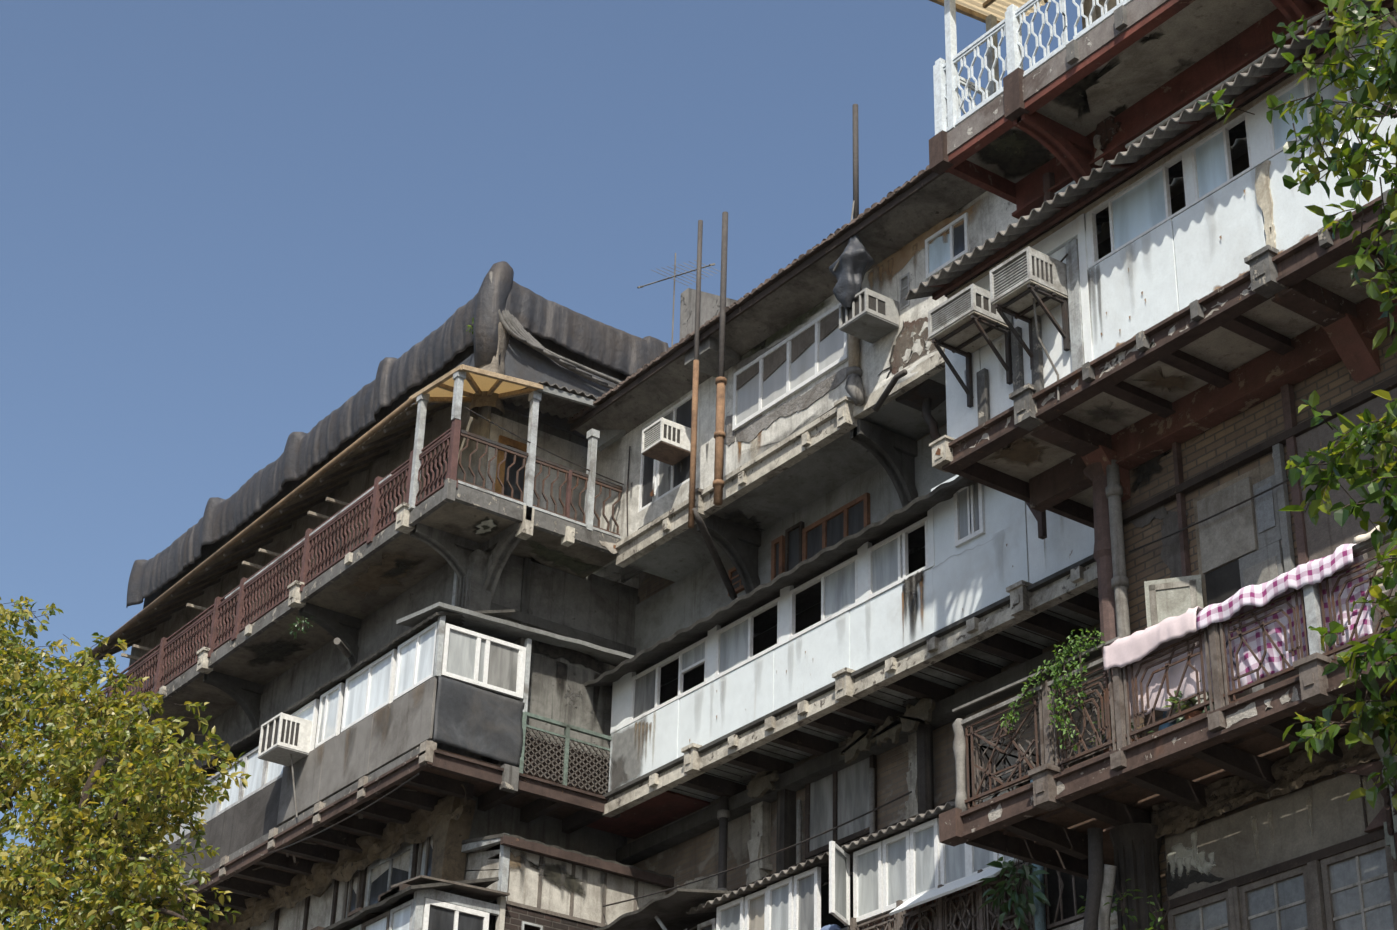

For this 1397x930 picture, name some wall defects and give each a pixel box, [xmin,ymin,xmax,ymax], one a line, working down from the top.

flaking render [891,317,944,375]
damp [902,574,923,633]
flaking render [1166,832,1225,897]